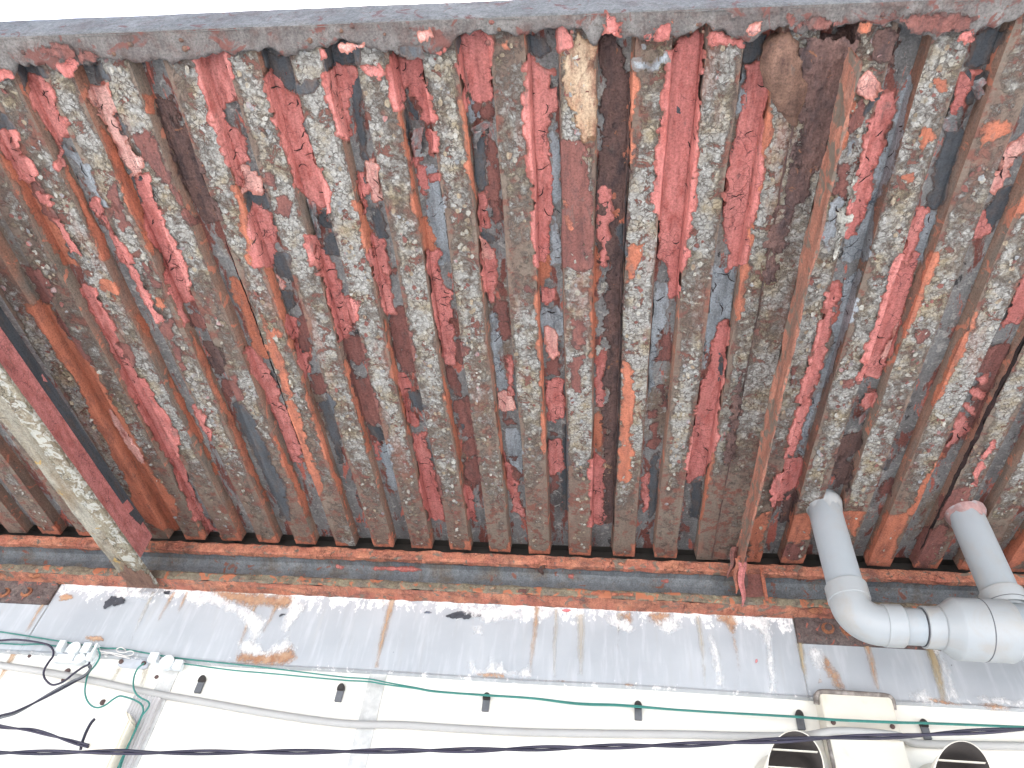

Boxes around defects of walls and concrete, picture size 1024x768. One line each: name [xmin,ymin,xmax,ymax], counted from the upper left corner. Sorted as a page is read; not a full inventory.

peeling [0,58,232,534]
peeling [172,30,513,546]
peeling [506,26,590,268]
peeling [541,28,786,351]
peeling [755,24,1024,534]
rust [214,591,292,612]
rust [237,648,295,666]
rust [371,531,394,547]
rust [380,600,394,649]
rust [448,537,472,550]
peeling [498,345,607,549]
rust [1002,529,1024,572]